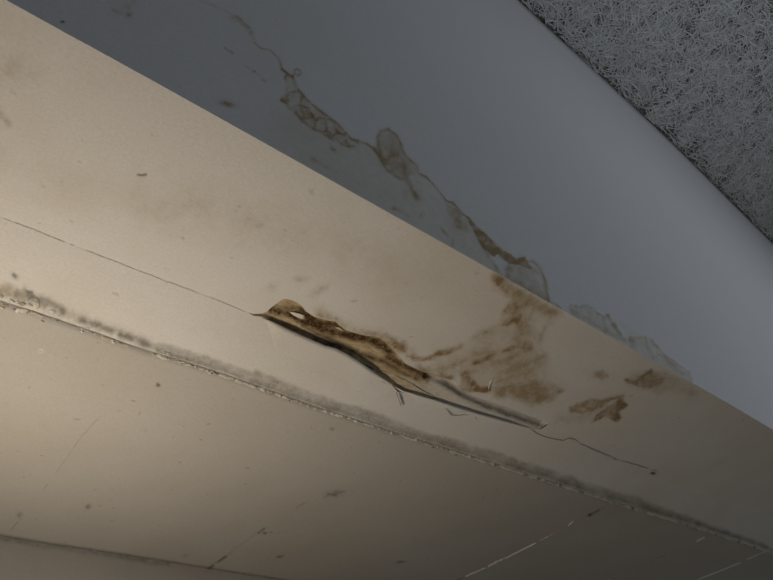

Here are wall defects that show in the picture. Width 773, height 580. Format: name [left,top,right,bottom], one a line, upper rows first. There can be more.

damp [460,214,531,269]
flaking render [250,299,548,429]
crack [531,429,656,471]